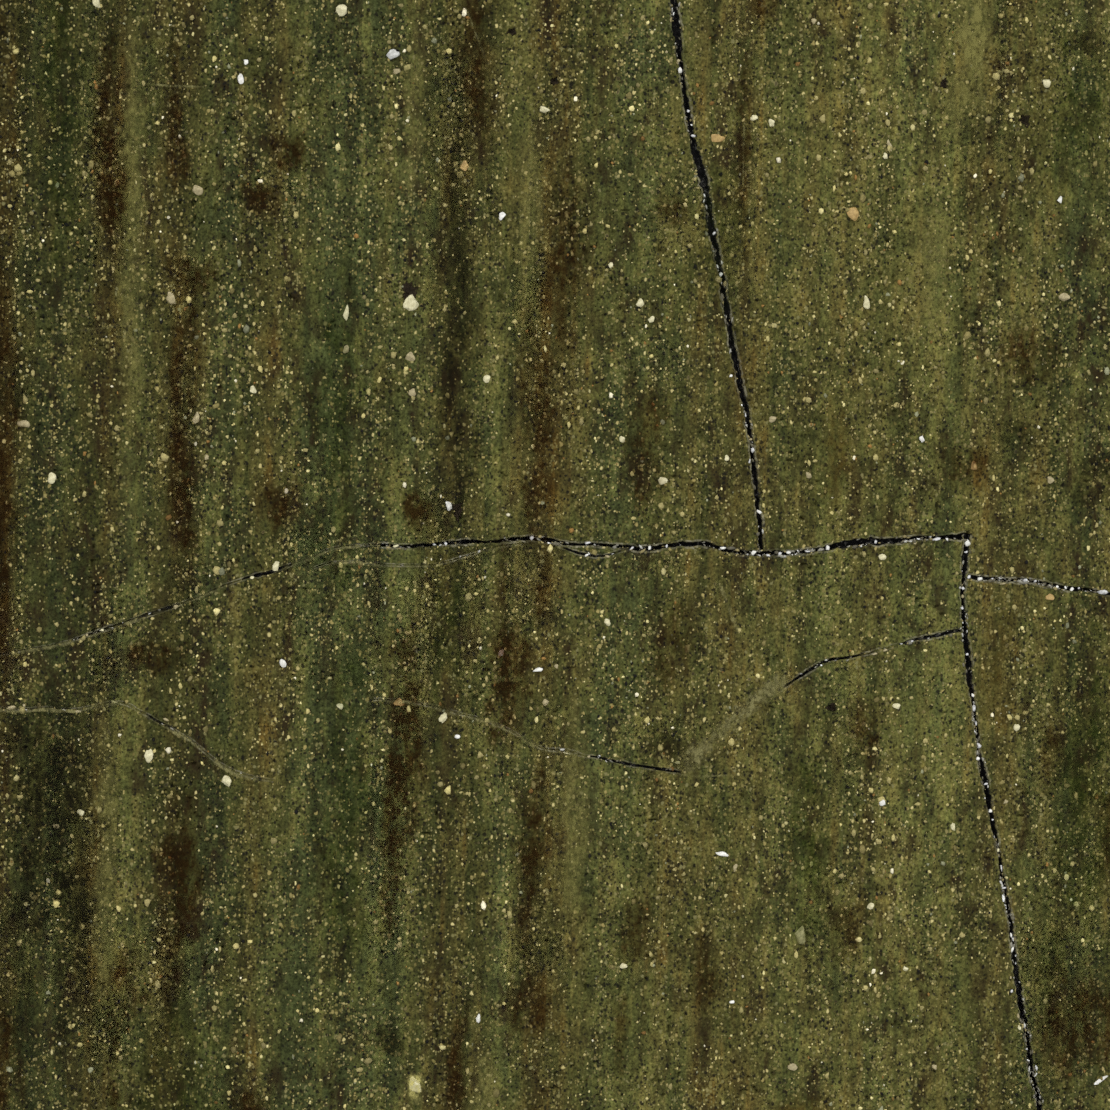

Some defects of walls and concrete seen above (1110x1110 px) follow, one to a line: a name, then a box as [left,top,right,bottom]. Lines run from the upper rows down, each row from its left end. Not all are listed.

crack [253,0,1110,1110]
crack [0,568,275,654]
crack [0,700,273,783]